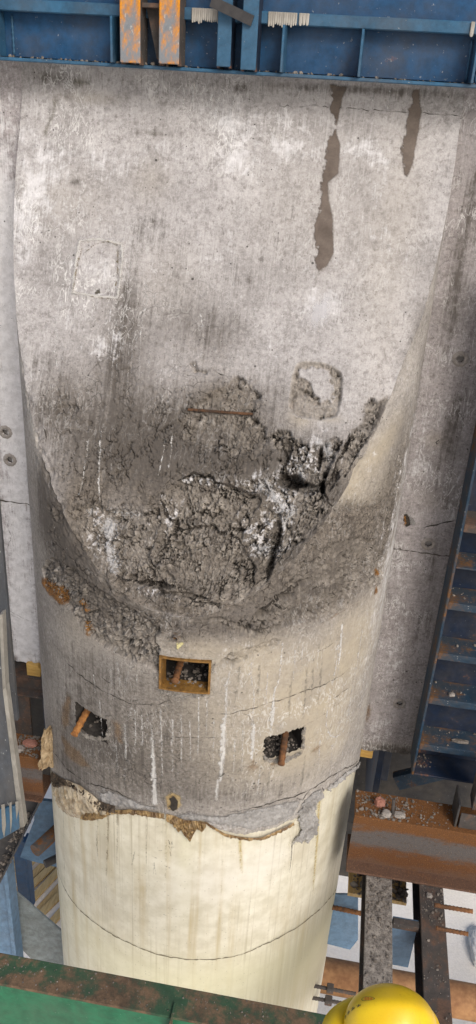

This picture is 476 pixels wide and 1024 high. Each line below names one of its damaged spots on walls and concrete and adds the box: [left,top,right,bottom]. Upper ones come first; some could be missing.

water stain [400,90,421,176]
water stain [314,85,346,271]
spalling [288,360,344,422]
spalling [41,374,390,701]
rust [42,578,91,636]
spalling [71,708,111,741]
spalling [263,727,306,766]
peeling [98,791,181,811]
peeling [293,761,360,845]